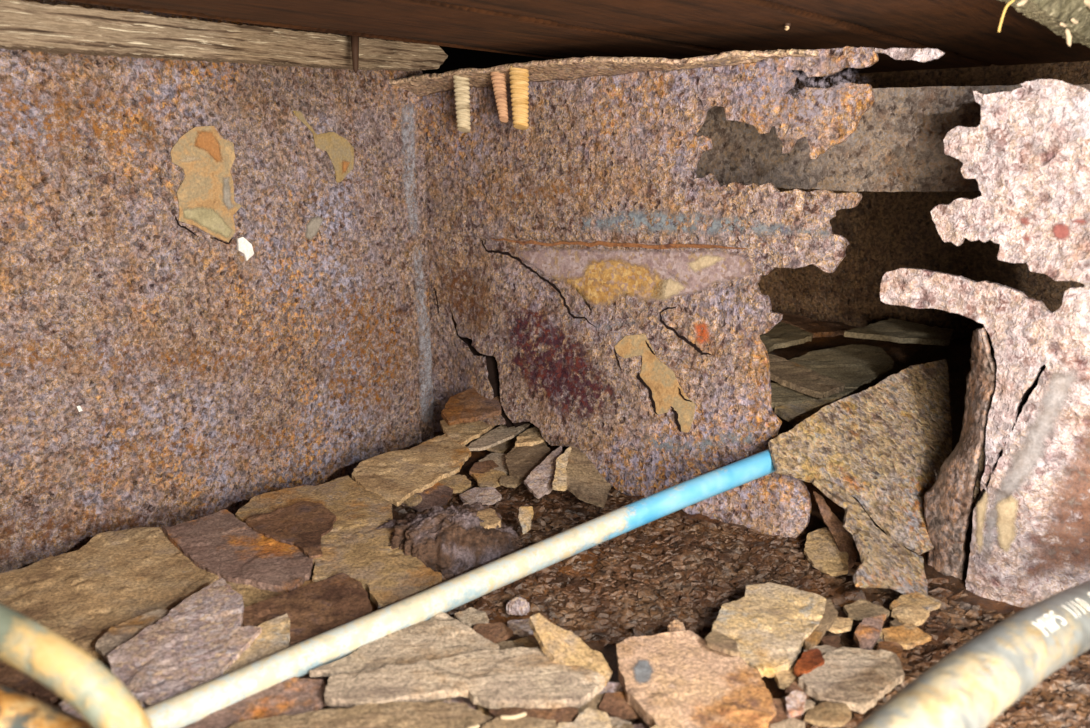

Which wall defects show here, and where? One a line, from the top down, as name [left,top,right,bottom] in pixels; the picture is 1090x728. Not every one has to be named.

rust [0,89,155,153]
peeling [170,126,254,261]
peeling [293,111,354,183]
spalling [1053,220,1086,239]
rust [327,289,404,410]
crack [435,290,529,428]
rust [506,309,612,417]
spalling [615,334,696,432]
crack [626,294,712,356]
crack [975,365,1046,505]
peeling [973,373,1076,557]
rust [0,511,143,559]